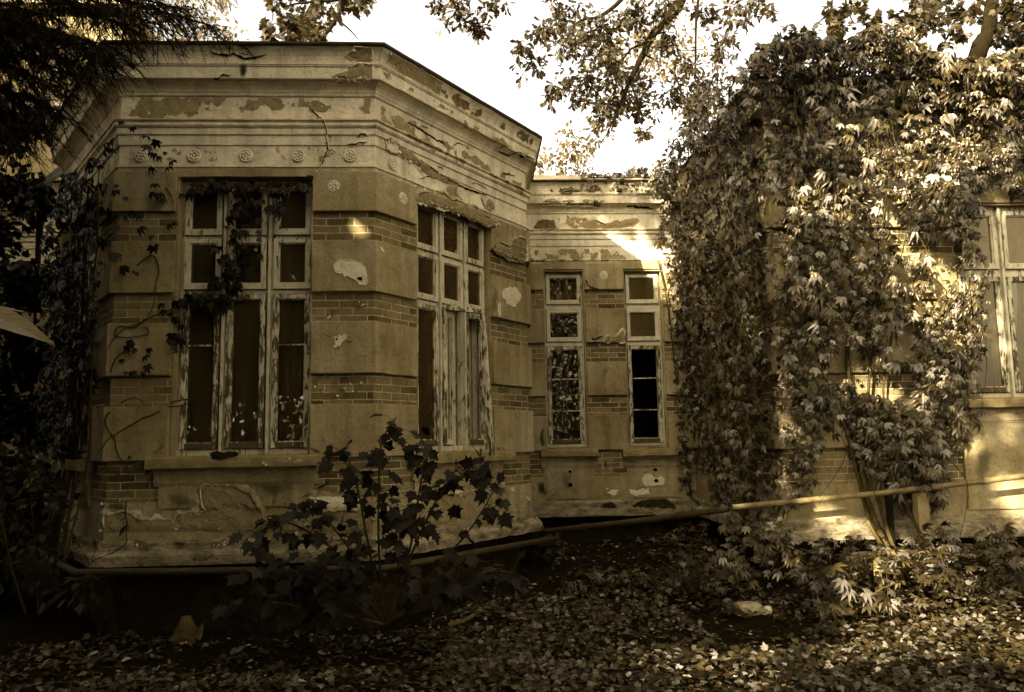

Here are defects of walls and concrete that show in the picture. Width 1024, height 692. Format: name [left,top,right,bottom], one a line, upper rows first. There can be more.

peeling [128,97,338,120]
flaking render [330,46,482,132]
crack [307,100,369,173]
flaking render [359,98,640,263]
peeling [332,258,370,308]
peeling [496,282,523,318]
peeling [332,333,348,348]
peeling [606,471,666,496]